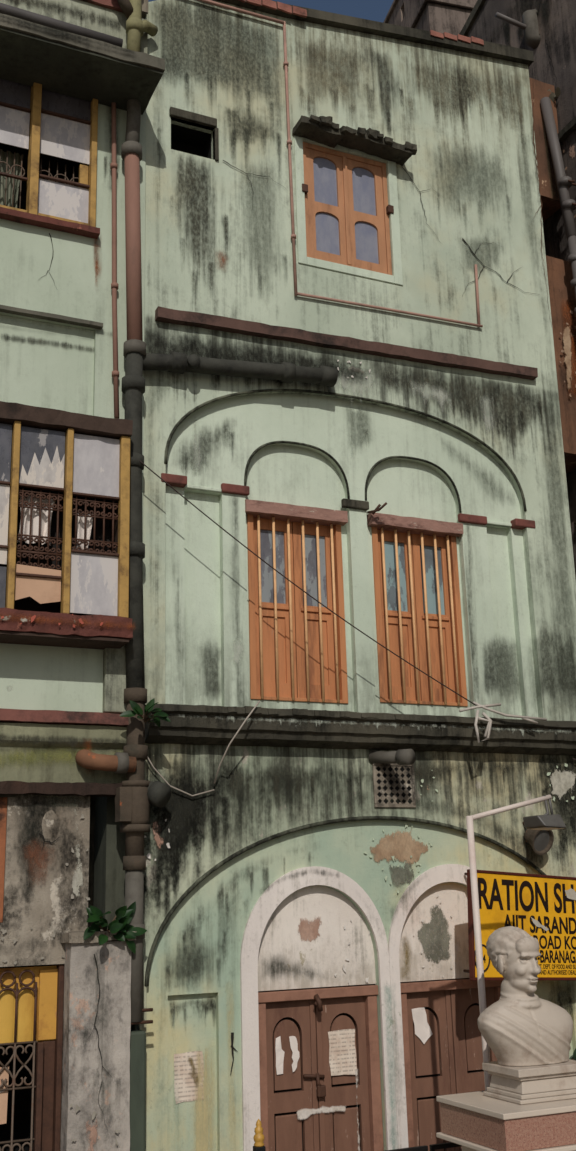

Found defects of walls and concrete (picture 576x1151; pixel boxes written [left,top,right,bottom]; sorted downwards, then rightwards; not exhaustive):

leakage [372,51,402,122]
crack [401,39,557,323]
leakage [145,332,546,438]
leakage [468,604,519,691]
leakage [536,632,576,697]
peeling [547,763,576,802]
leakage [143,767,334,914]
spalling [364,822,432,894]
leakage [166,917,205,980]
leakage [270,960,313,975]
peeling [299,918,322,942]
crack [93,954,111,1130]